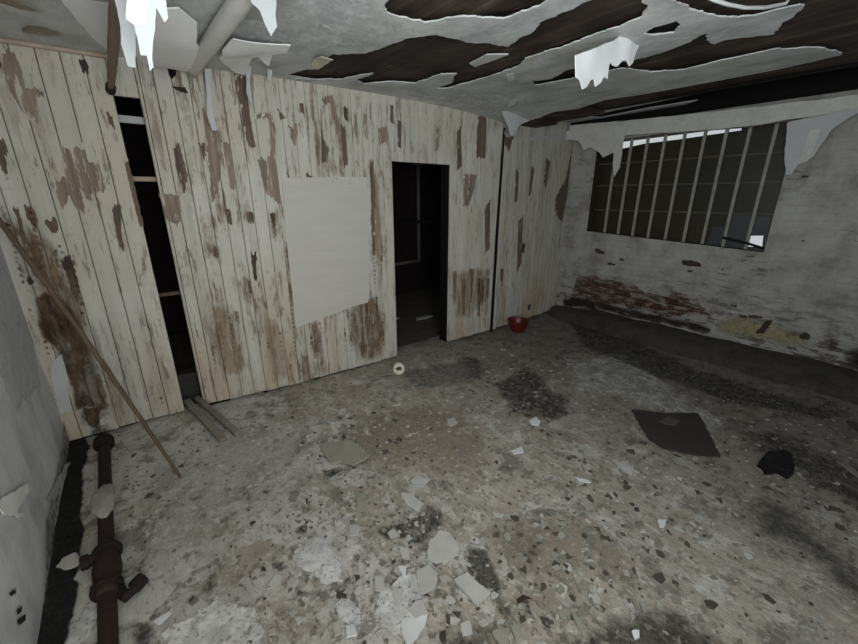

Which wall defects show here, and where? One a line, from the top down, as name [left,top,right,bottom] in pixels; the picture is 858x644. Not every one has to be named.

peeling [61,0,168,70]
peeling [296,0,648,84]
peeling [575,0,858,89]
peeling [321,95,348,183]
peeling [514,158,550,202]
peeling [555,125,626,224]
peeling [784,107,858,178]
water stain [36,293,124,644]